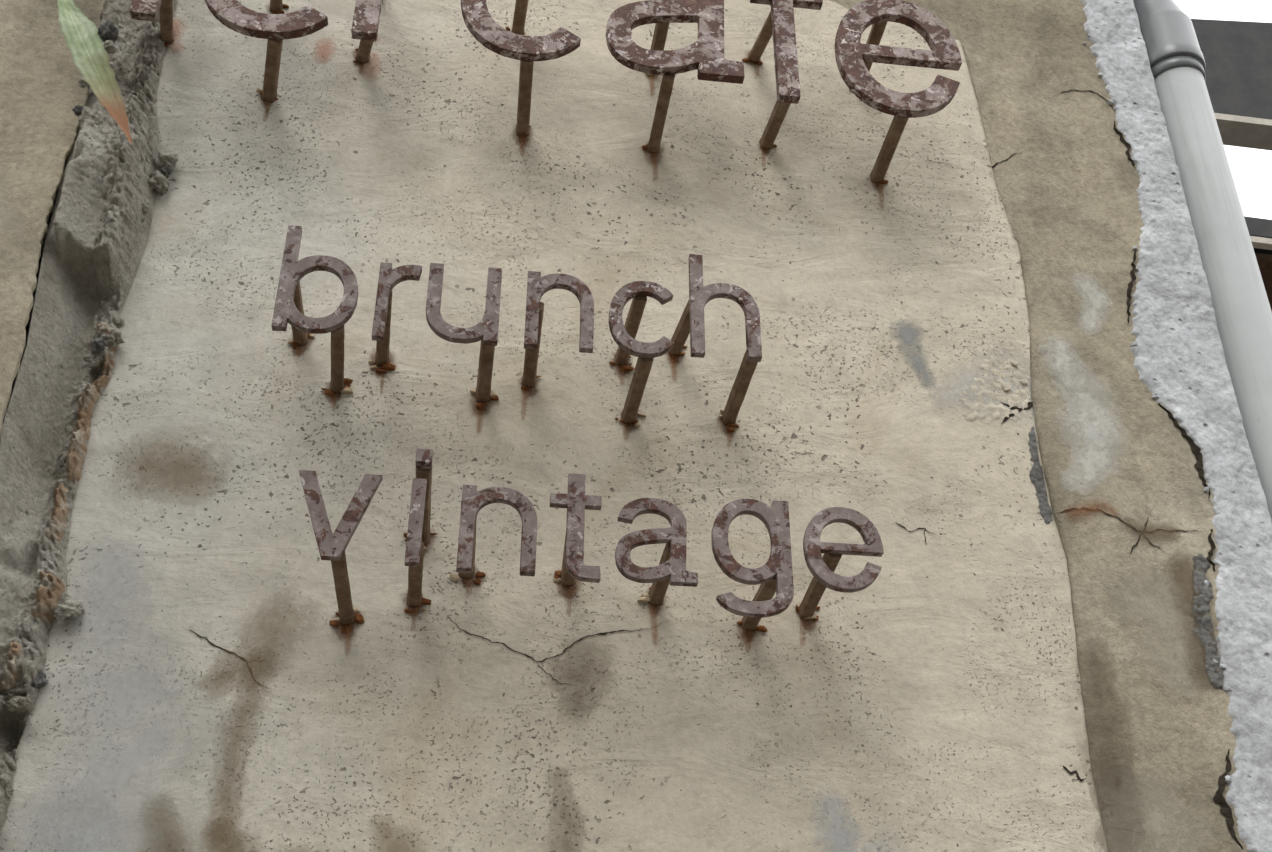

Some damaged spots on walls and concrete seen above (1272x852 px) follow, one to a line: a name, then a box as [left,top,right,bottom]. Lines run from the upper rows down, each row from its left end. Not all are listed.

crack [1061,89,1116,113]
spalling [0,0,178,837]
peeling [1080,0,1272,852]
crack [1056,507,1198,554]
crack [190,630,267,688]
crack [447,616,675,686]